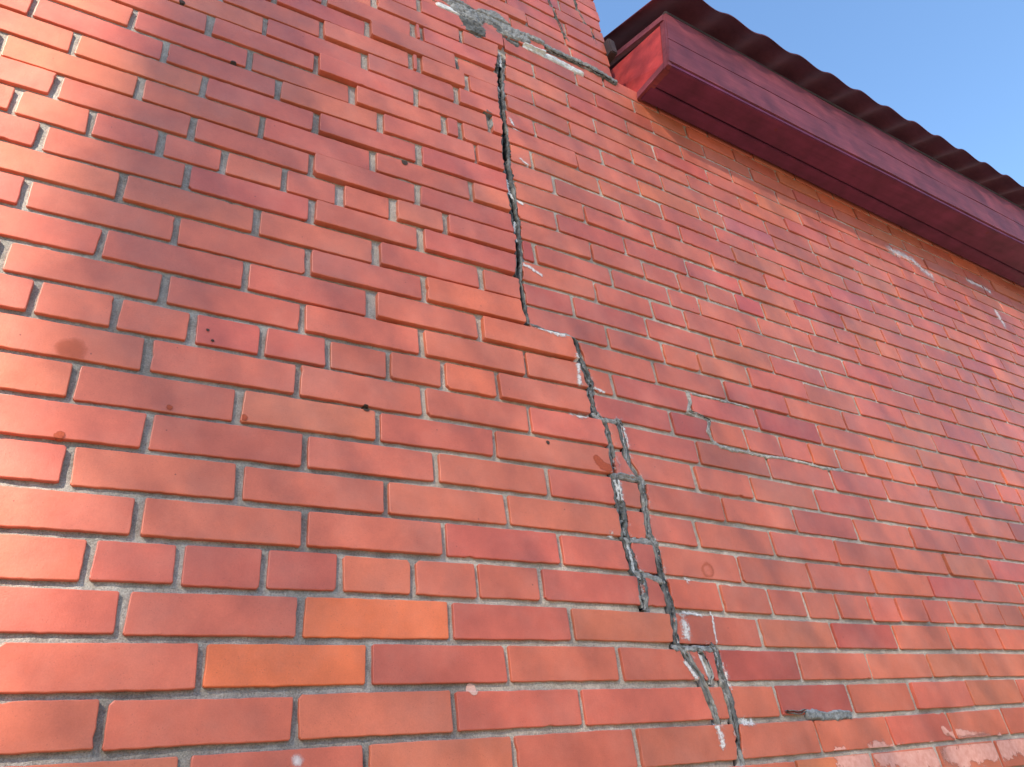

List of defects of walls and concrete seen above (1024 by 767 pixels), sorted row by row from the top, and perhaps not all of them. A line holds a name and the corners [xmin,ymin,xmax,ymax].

crack [433,0,753,766]
peeling [834,726,1024,767]